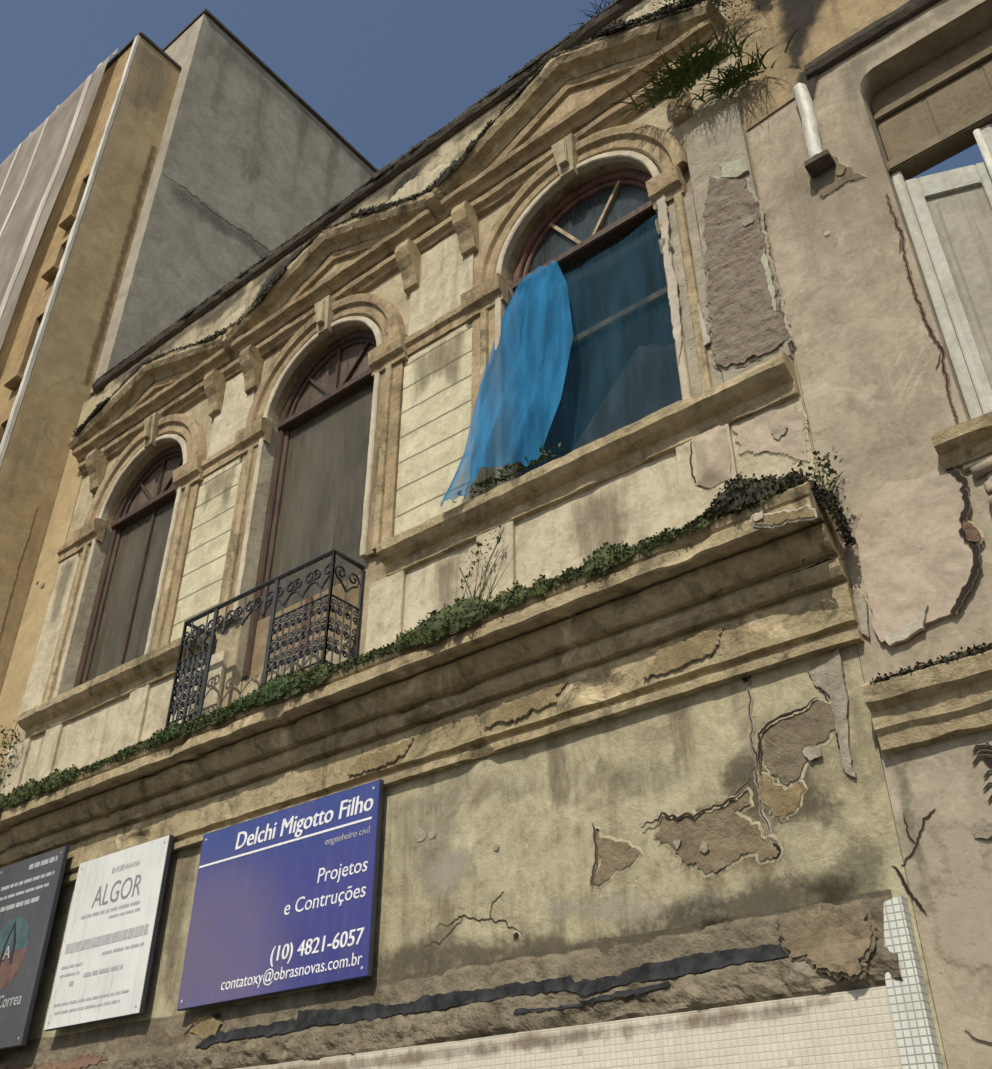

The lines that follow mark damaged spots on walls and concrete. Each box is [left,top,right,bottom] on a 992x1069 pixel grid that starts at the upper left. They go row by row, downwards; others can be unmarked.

damp [753,0,823,97]
crack [163,173,271,258]
peeling [654,194,682,364]
flaking render [697,159,793,372]
crack [885,193,959,425]
spalling [942,465,984,614]
peeling [884,605,929,647]
flaking render [641,647,857,879]
flaking render [590,823,644,889]
crack [892,809,936,915]
crack [423,891,522,947]
spalling [775,904,878,982]